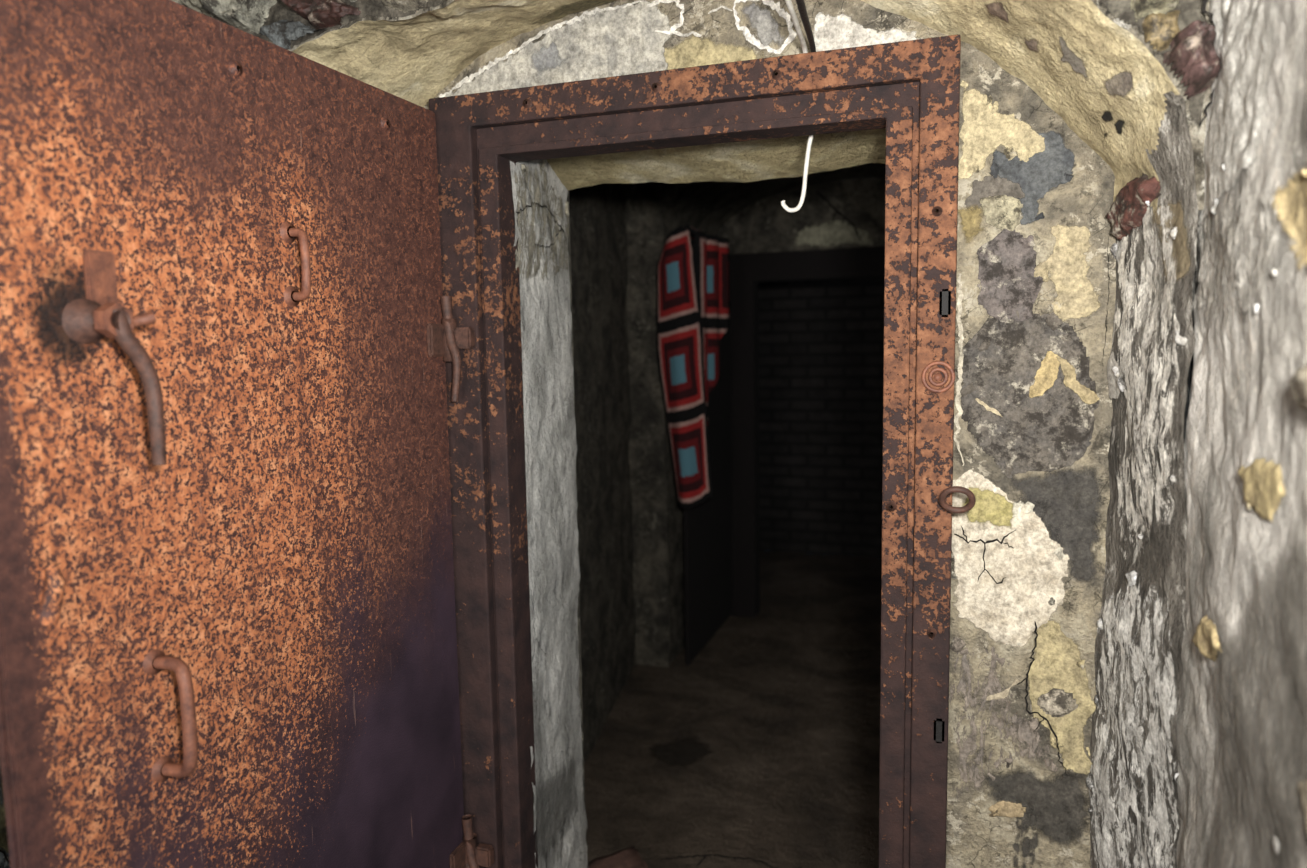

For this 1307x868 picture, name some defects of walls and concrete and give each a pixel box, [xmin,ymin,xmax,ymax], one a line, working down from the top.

spalling [171,0,443,50]
spalling [985,2,1009,22]
spalling [1025,39,1038,52]
spalling [1059,37,1087,78]
peeling [1100,0,1307,331]
peeling [514,159,569,280]
flaking render [794,220,873,247]
spalling [949,81,1187,868]
spalling [1237,458,1286,522]
spalling [1192,615,1223,661]
spalling [587,846,648,868]